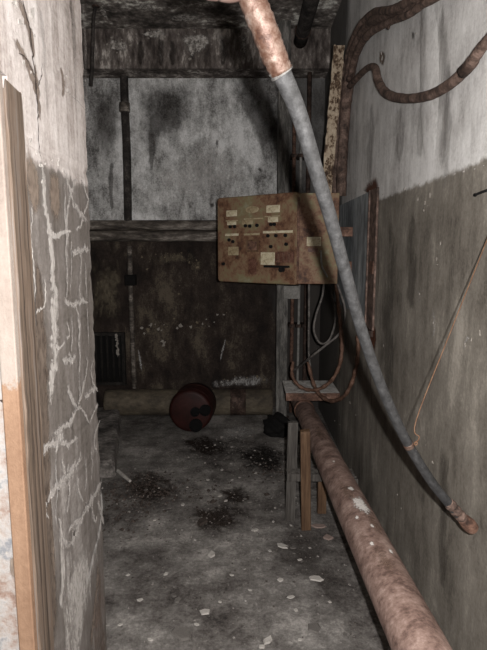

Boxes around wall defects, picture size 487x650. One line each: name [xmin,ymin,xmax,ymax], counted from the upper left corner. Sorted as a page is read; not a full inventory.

crack [19,2,42,156]
damp [147,93,182,137]
crack [44,174,104,548]